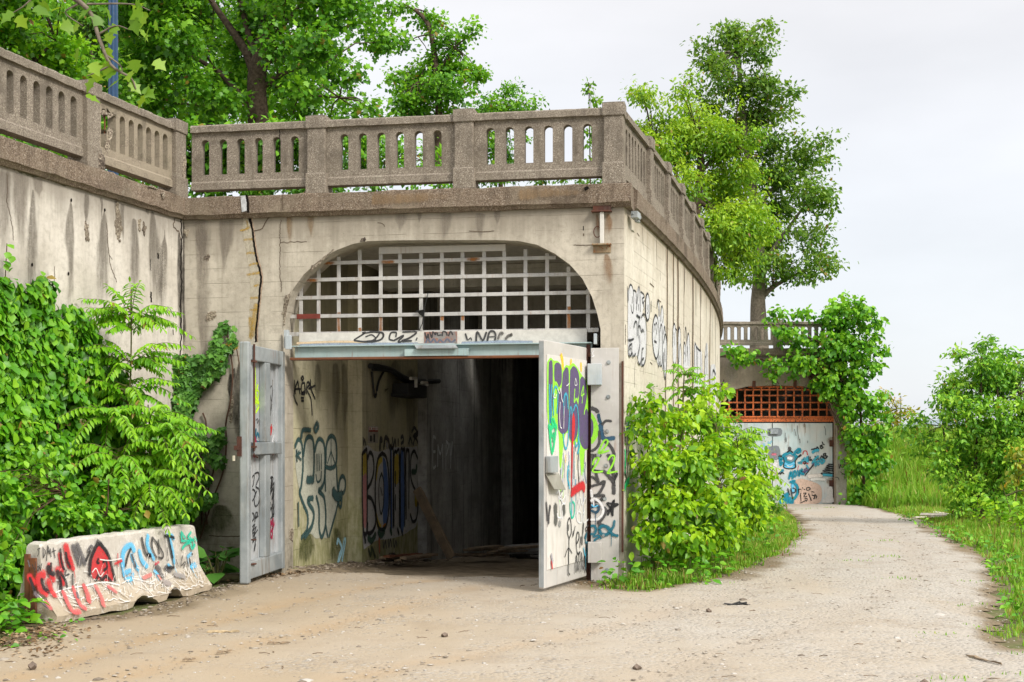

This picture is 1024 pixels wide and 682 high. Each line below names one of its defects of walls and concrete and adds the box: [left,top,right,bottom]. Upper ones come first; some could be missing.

damp [66,194,88,275]
damp [100,200,186,339]
crack [245,194,307,342]